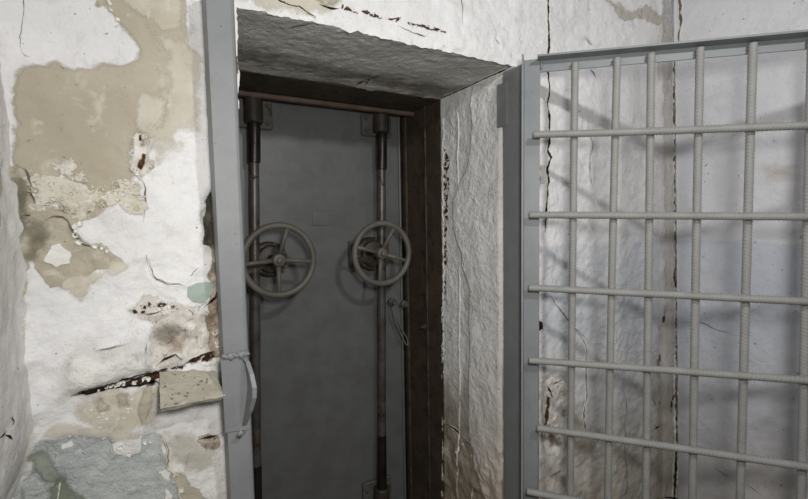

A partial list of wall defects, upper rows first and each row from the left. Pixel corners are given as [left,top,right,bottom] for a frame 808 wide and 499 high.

peeling [8,0,201,301]
crack [276,0,339,28]
rust [341,4,446,33]
crack [540,0,553,232]
crack [676,0,684,41]
peeling [13,192,220,499]
crack [653,61,678,499]